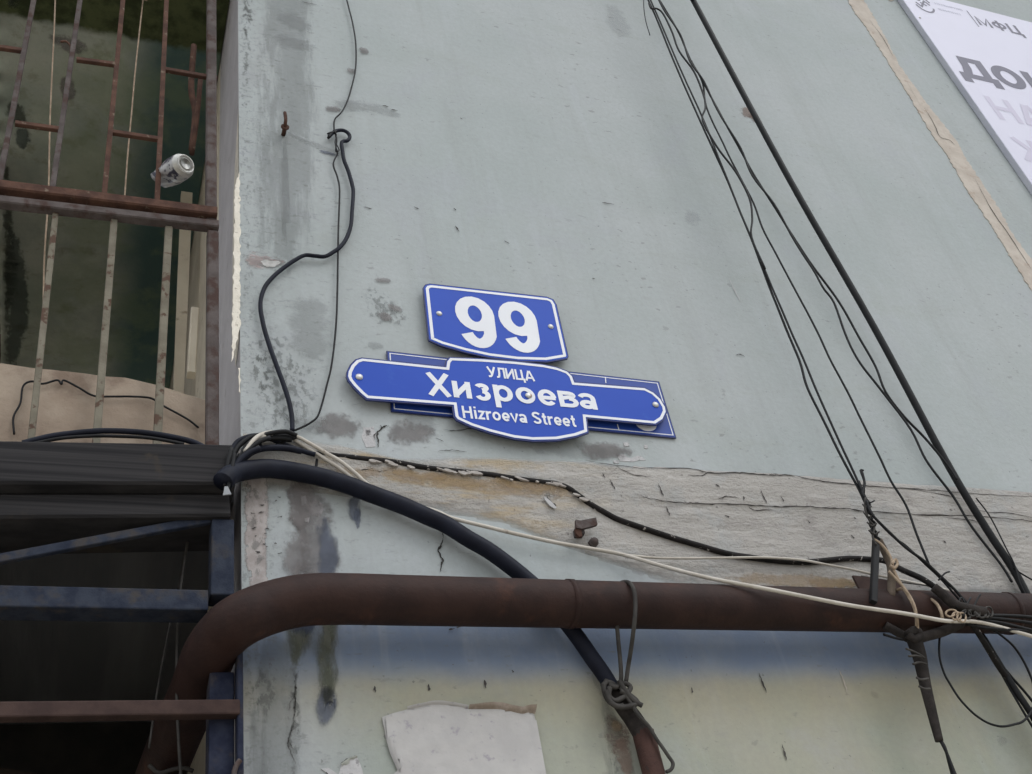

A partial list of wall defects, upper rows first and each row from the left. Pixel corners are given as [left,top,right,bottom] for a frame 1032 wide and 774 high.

damp [251,482,338,575]
crack [586,460,1032,522]
damp [289,625,338,722]
peeling [321,755,363,774]